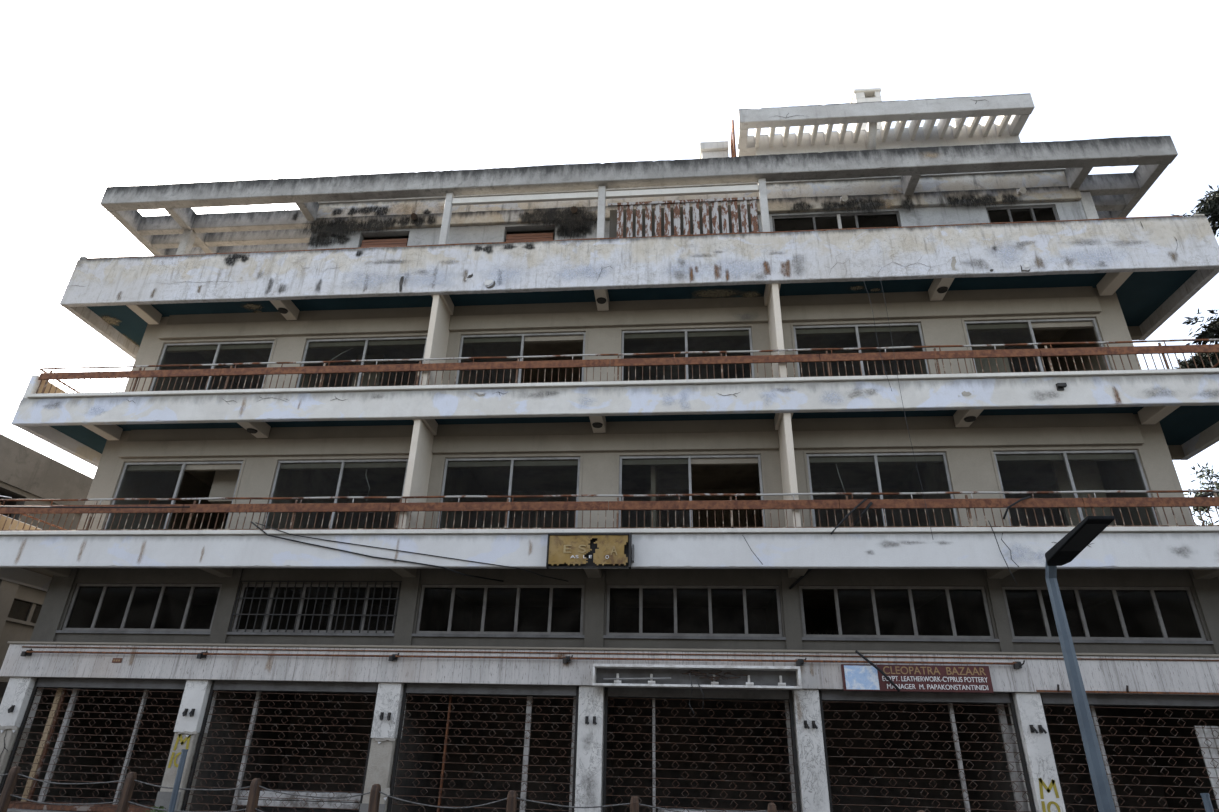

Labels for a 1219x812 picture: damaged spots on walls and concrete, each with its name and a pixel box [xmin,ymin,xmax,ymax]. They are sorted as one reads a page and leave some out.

water stain [293,206,435,256]
water stain [519,207,597,238]
water stain [225,254,248,265]
rust [764,261,790,276]